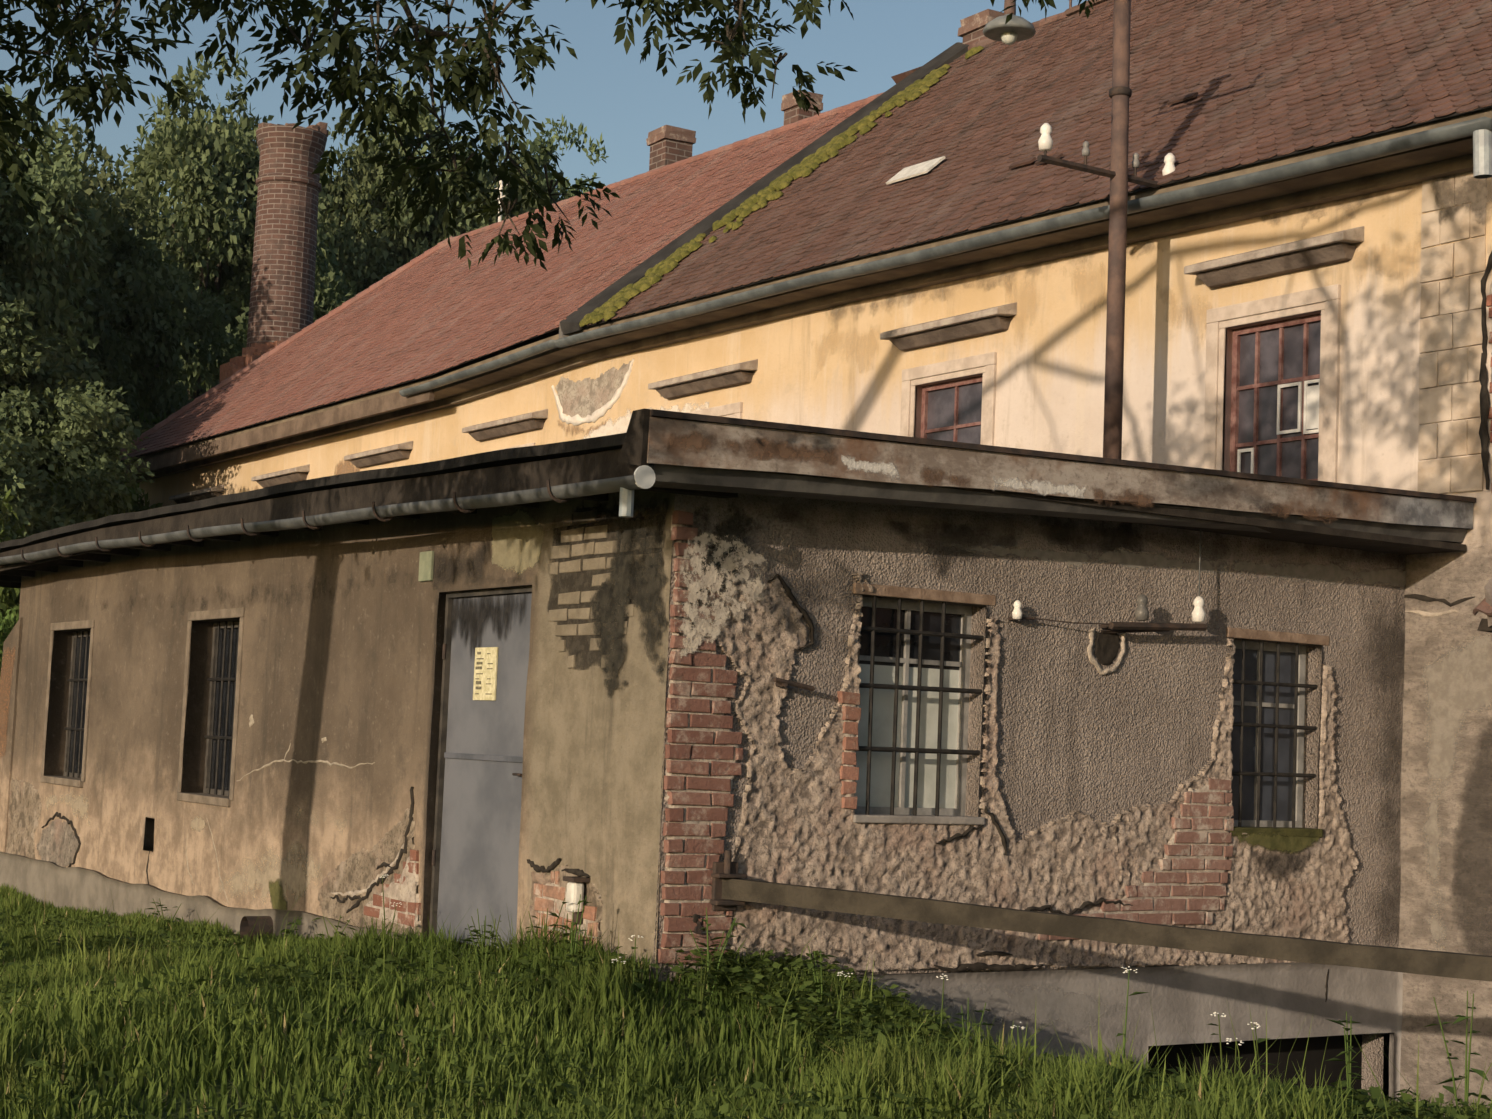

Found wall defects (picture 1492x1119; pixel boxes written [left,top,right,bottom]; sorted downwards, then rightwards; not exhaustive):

crack [1479,251,1492,490]
flaking render [5,778,89,867]
crack [330,787,415,913]
flaking render [529,864,604,953]
flaking render [548,499,1359,973]
damp [1454,732,1492,956]